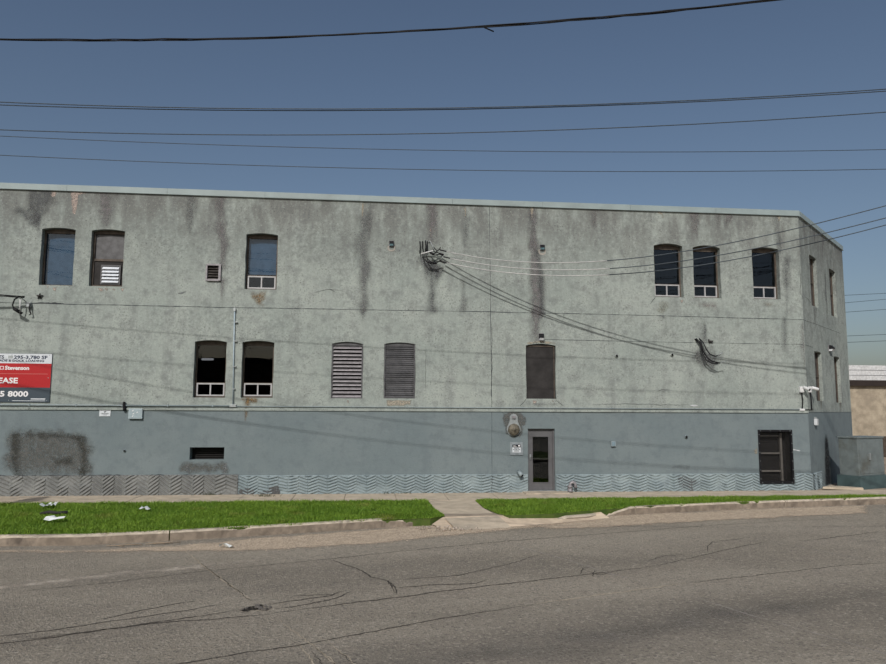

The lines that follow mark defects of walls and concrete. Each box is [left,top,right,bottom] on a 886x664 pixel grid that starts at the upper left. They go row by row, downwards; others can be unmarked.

damp [20,190,51,227]
damp [360,217,370,312]
damp [421,259,442,312]
damp [530,207,543,337]